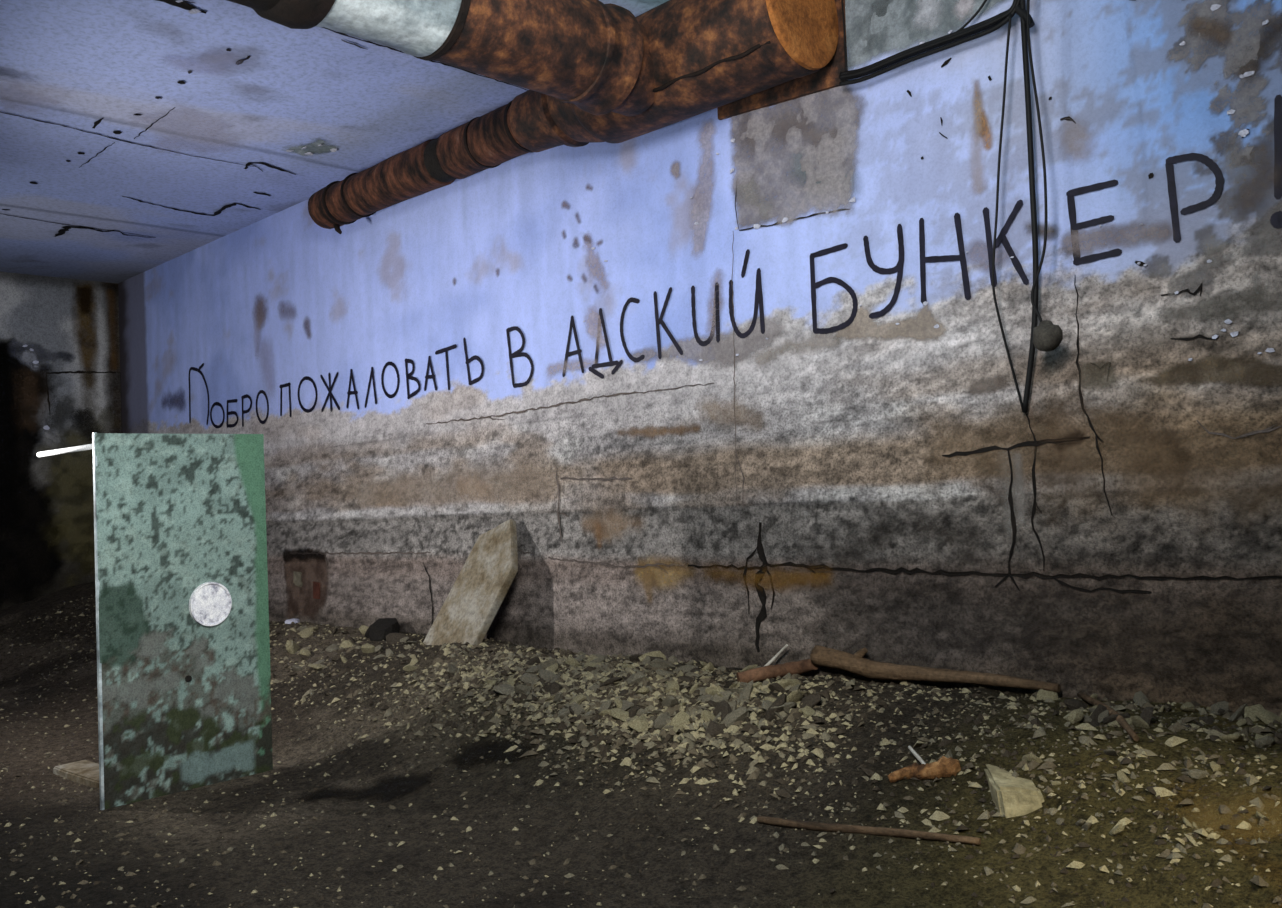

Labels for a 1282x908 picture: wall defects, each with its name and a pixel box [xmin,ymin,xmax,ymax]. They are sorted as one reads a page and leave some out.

crack [156,0,206,14]
crack [322,27,527,90]
rust [435,0,655,116]
crack [1,108,296,216]
spalling [690,85,862,252]
crack [0,209,156,238]
crack [426,185,1282,652]